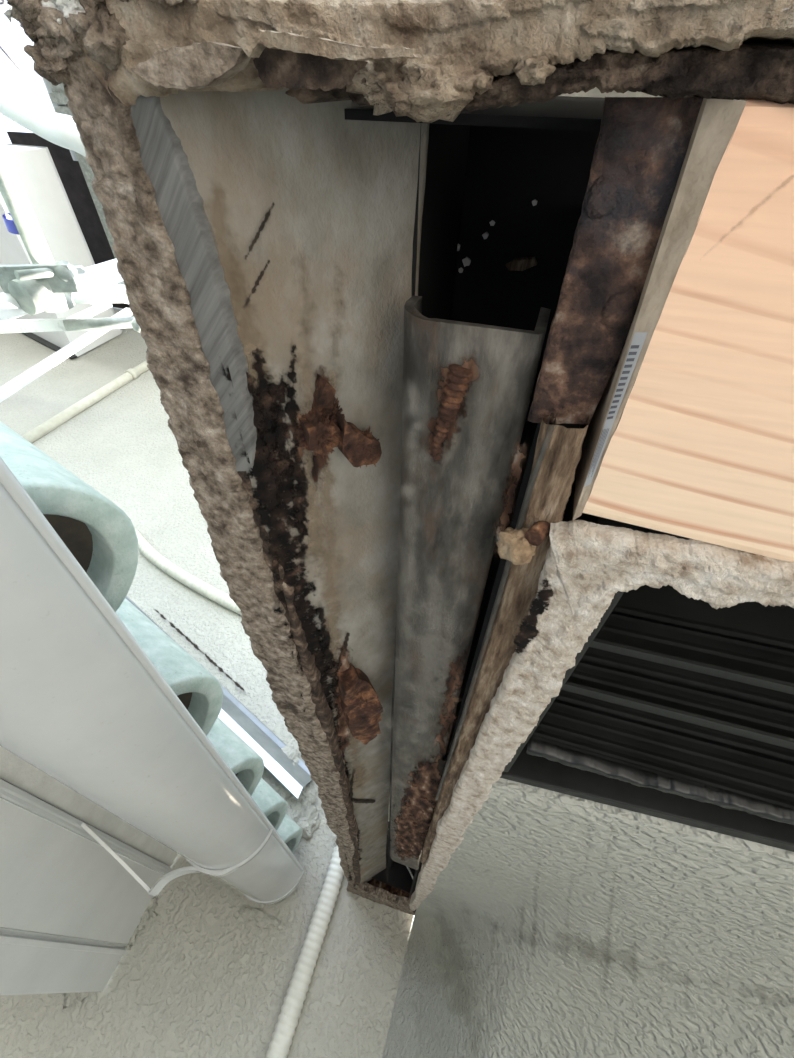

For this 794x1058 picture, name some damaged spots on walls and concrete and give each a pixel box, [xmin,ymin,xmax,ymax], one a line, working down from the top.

spalling [6,0,605,320]
rust [293,367,382,483]
rust [420,357,480,462]
rust [496,443,525,551]
spalling [507,422,547,529]
rust [334,646,383,761]
rust [393,651,466,860]
spalling [444,551,506,761]